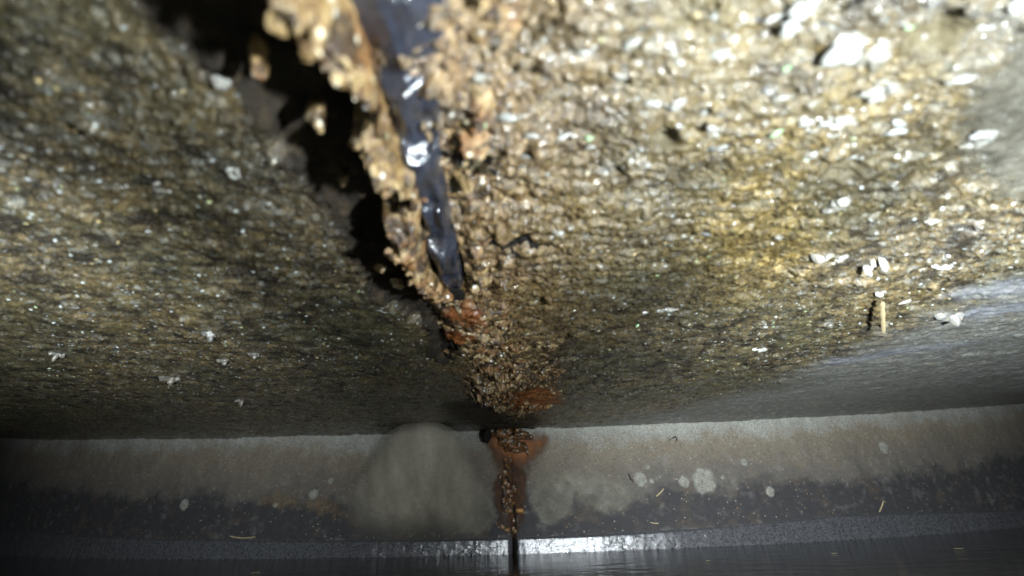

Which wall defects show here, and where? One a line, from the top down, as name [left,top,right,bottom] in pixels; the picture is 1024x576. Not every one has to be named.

spalling [137,0,459,364]
corrosion [248,0,566,534]
spalling [457,160,491,174]